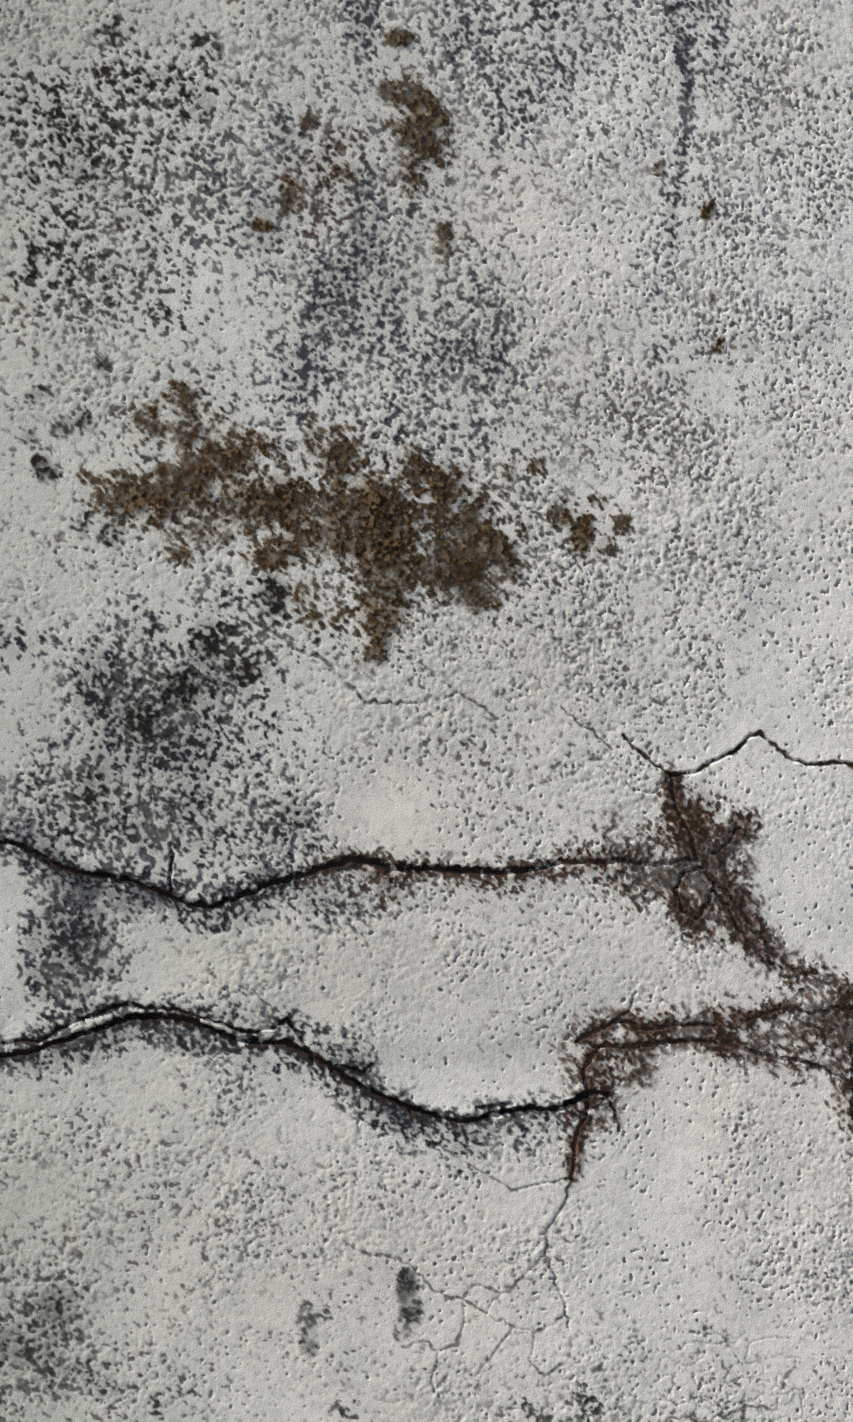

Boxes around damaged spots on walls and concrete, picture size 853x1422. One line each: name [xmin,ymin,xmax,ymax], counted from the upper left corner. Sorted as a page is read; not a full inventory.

corrosion [252,108,366,238]
crack [0,722,853,1374]